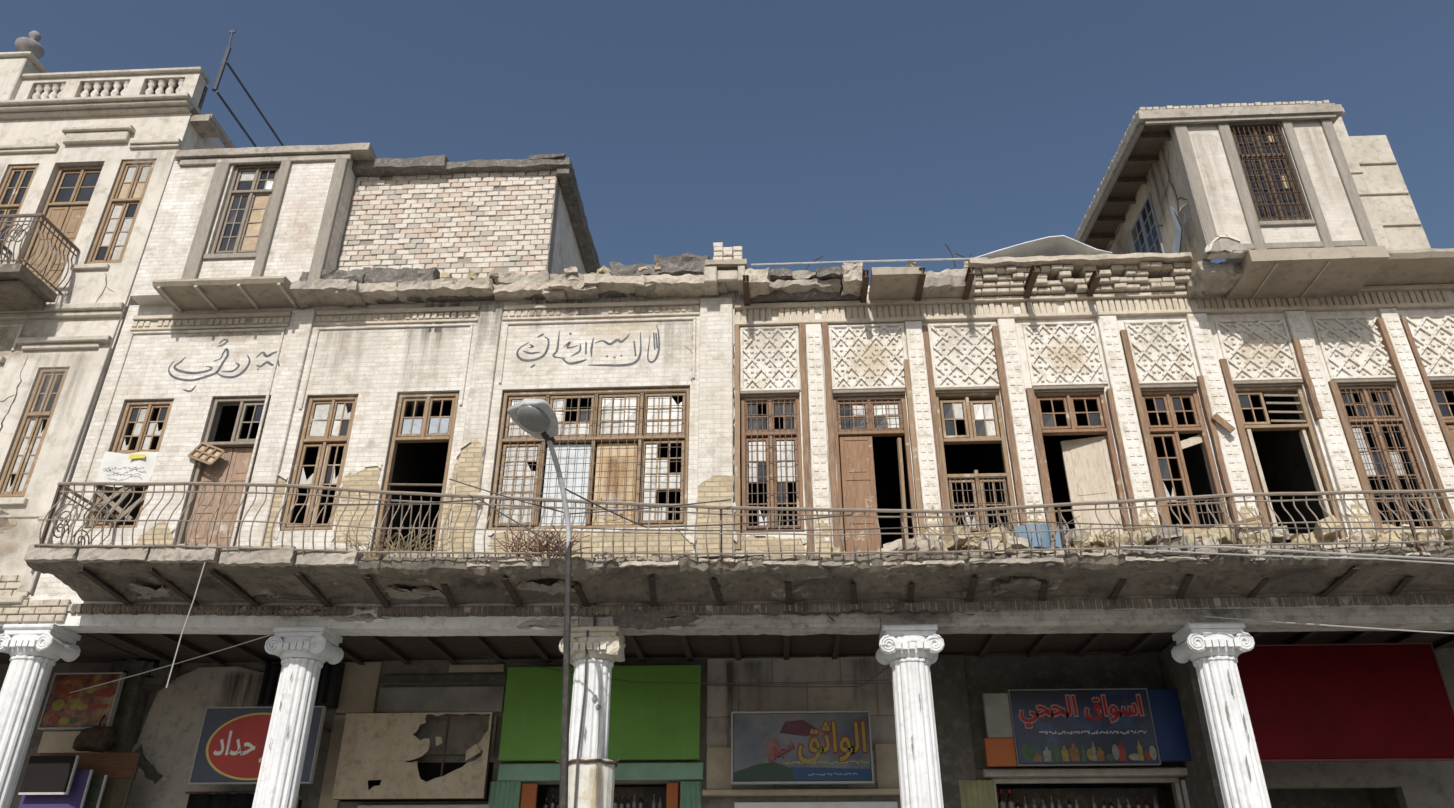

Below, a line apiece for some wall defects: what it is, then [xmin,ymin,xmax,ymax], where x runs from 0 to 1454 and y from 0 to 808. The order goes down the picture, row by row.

crack [0,359,27,431]
flaking render [330,464,383,548]
spalling [385,439,1223,597]
spalling [1238,497,1431,561]
spalling [129,584,174,601]
peeling [510,616,581,630]